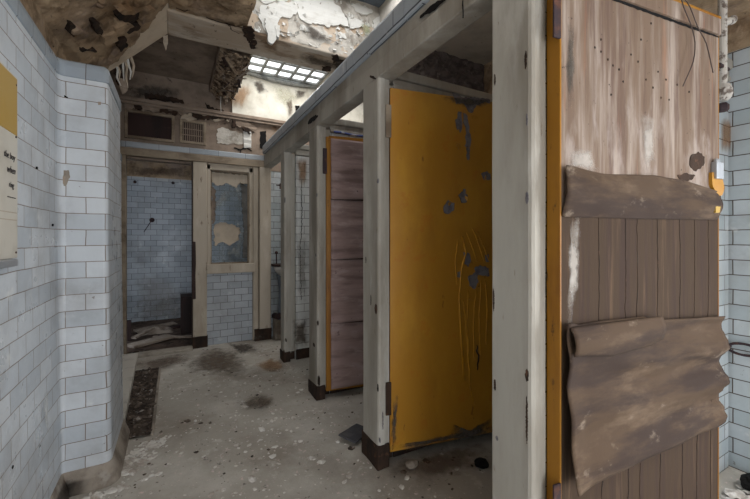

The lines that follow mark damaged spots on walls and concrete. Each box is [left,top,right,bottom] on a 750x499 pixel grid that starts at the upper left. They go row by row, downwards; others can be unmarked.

flaking render [20,0,380,72]
flaking render [125,93,266,149]
peeling [212,172,247,258]
damp [193,344,255,376]
damp [246,396,272,407]